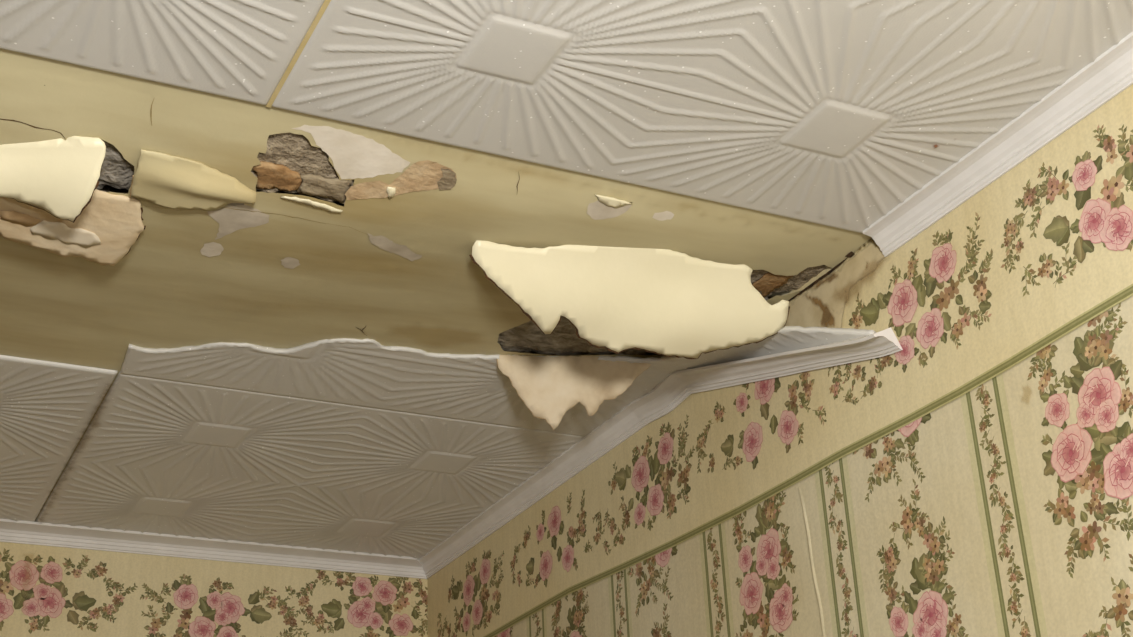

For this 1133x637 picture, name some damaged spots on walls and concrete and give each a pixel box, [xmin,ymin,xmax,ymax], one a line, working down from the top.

peeling [0,125,457,266]
peeling [469,240,828,430]